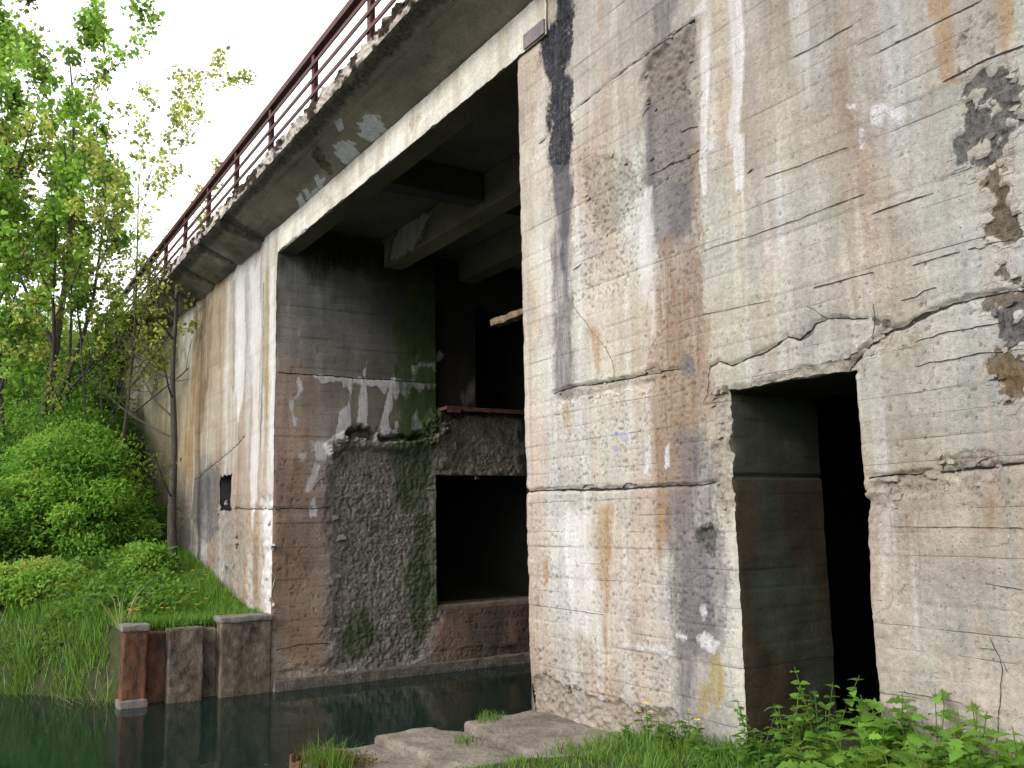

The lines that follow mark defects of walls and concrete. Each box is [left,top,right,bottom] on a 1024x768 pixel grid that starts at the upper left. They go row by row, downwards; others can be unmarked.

corrosion [175,273,238,455]
leakage [125,0,523,608]
spalling [321,424,432,674]
spalling [417,411,527,506]
leakage [532,0,581,412]
leakage [631,0,776,345]
crack [703,272,1024,402]
corrosion [921,0,963,97]
peeling [946,52,1024,415]